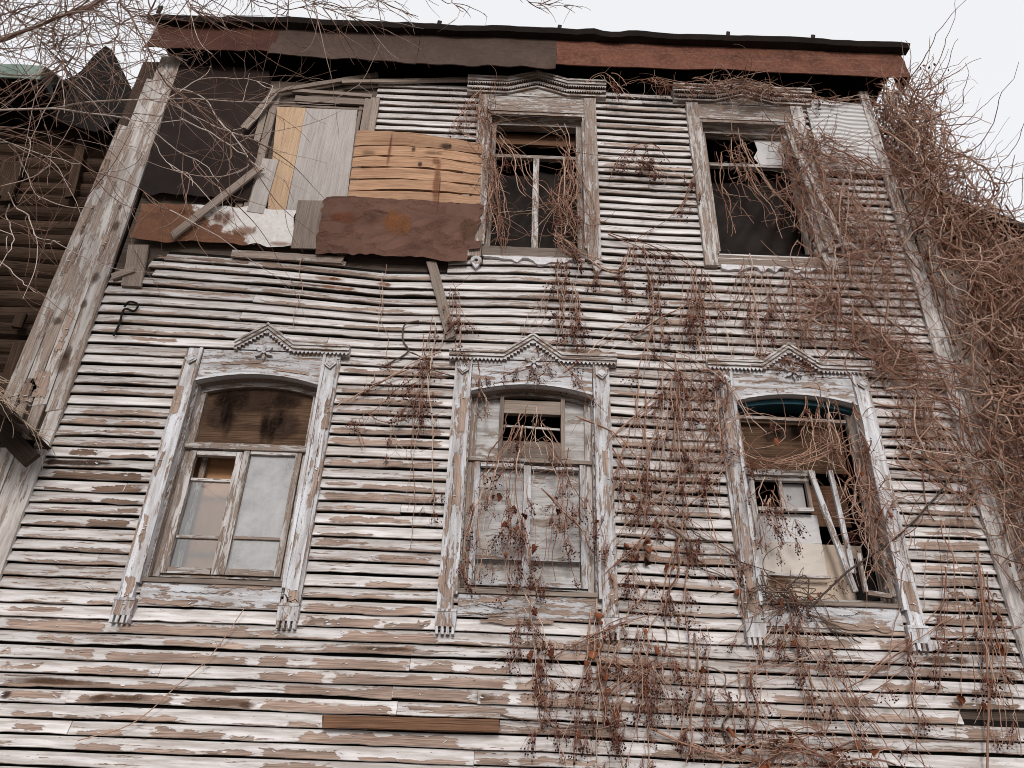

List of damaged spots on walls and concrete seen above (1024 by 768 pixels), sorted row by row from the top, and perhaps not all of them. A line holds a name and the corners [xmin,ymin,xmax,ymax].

corrosion [214,212,256,234]
peeling [98,309,229,343]
peeling [19,370,52,398]
water stain [208,389,301,442]
peeling [35,385,184,549]
peeling [453,452,462,506]
peeling [885,453,956,509]
peeling [0,508,1022,768]